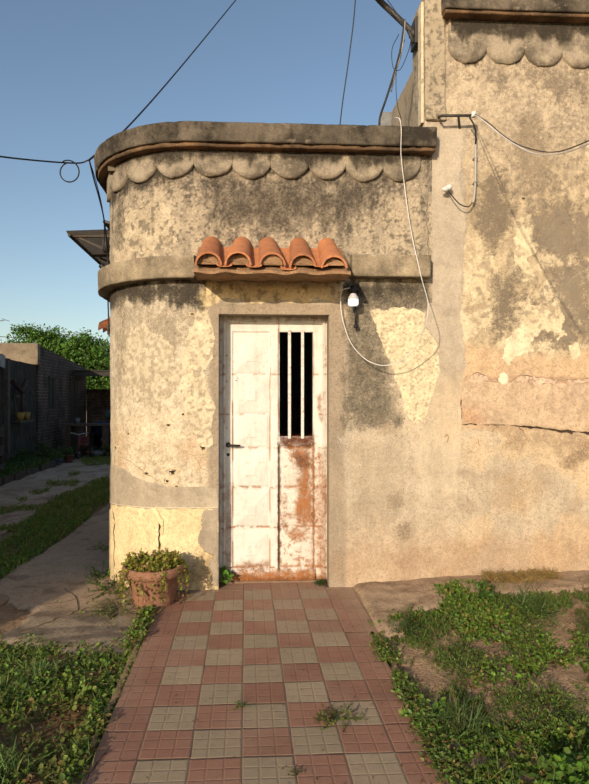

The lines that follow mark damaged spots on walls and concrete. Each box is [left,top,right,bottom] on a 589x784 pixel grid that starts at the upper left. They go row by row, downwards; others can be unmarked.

peeling [370,307,440,424]
corrosion [232,436,327,581]